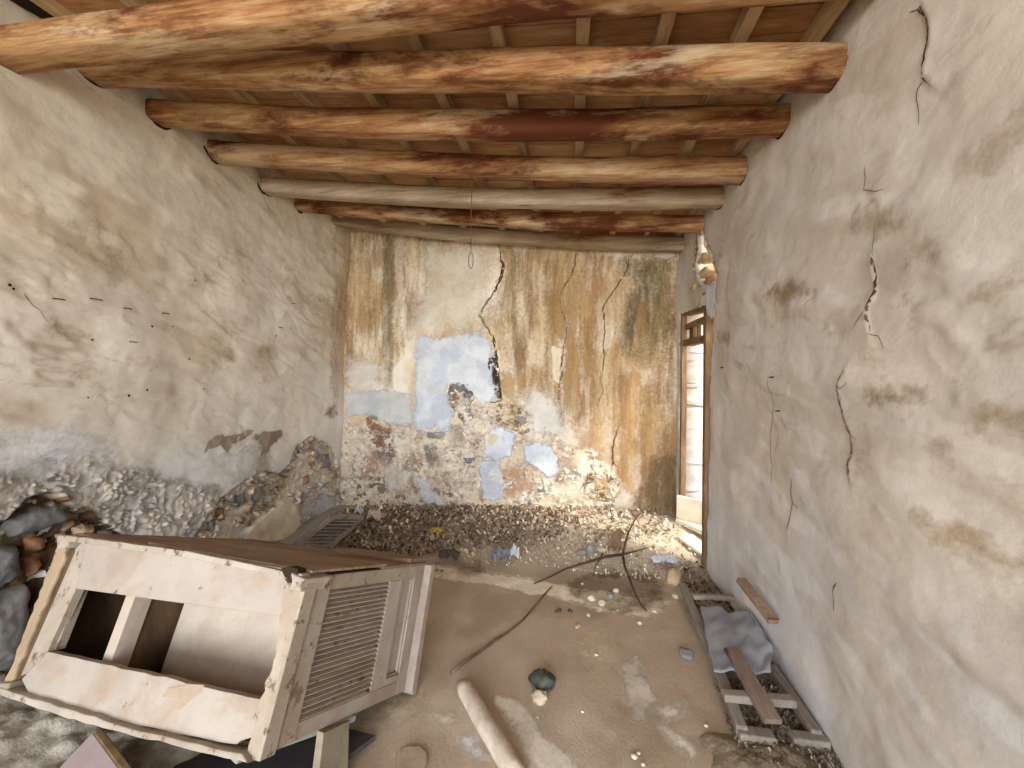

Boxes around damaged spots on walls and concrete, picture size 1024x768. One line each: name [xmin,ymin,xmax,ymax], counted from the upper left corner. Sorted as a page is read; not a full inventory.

crack [909,6,929,124]
leakage [337,231,452,384]
crack [478,245,505,403]
leakage [494,247,678,514]
crack [558,252,633,422]
crack [767,378,793,527]
crack [836,372,855,475]
crack [852,232,883,346]
spalling [0,382,620,677]